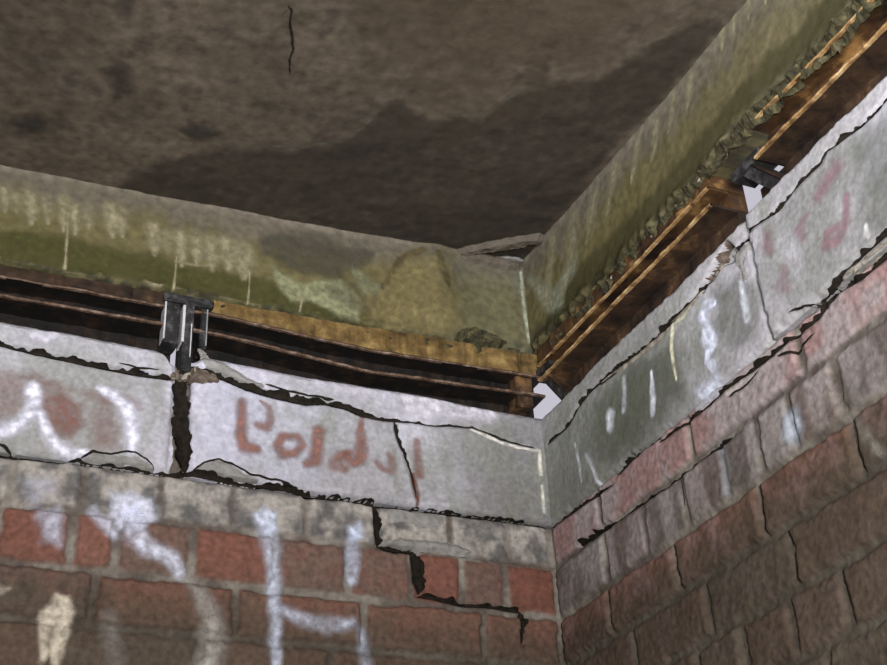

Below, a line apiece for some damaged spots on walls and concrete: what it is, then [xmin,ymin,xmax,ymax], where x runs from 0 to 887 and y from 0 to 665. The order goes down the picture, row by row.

crack [283,5,295,74]
leakage [0,186,49,225]
leakage [29,330,60,343]
leakage [59,198,91,270]
leakage [159,301,167,345]
leakage [176,305,192,357]
leakage [147,223,251,305]
leakage [275,268,399,320]
leakage [519,271,530,343]
leakage [537,0,848,322]
crack [736,98,887,251]
crack [0,228,887,644]